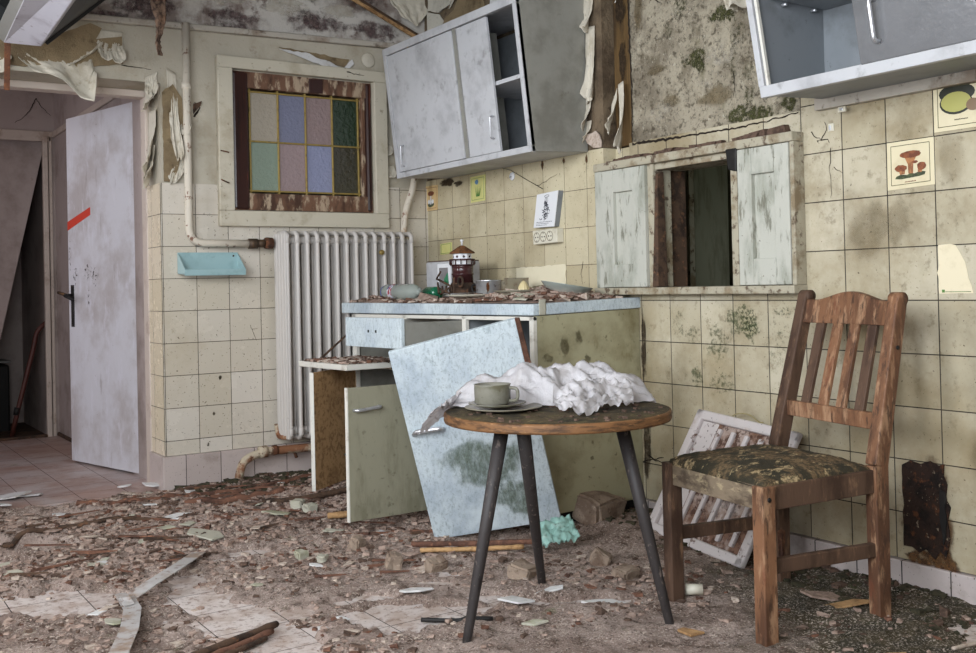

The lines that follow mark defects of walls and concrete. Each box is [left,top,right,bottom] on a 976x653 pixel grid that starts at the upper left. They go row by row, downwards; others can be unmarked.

leakage [91,0,154,18]
mould [209,9,257,29]
mould [288,11,394,41]
spalling [0,23,123,67]
leakage [699,88,729,103]
spalling [585,131,602,148]